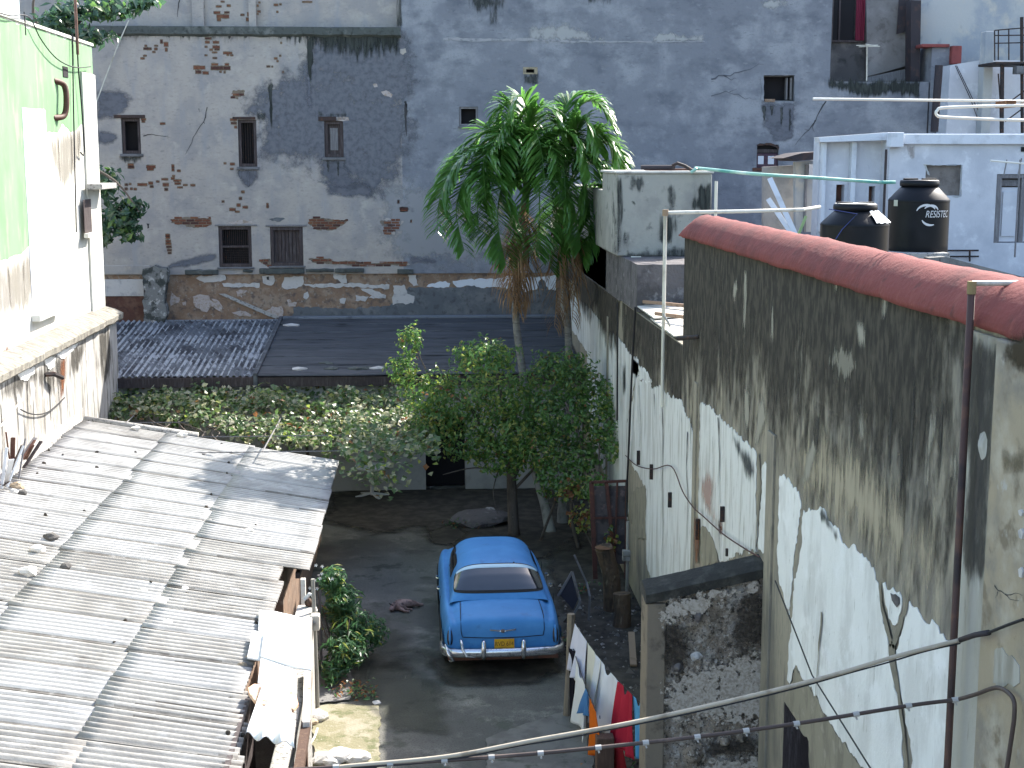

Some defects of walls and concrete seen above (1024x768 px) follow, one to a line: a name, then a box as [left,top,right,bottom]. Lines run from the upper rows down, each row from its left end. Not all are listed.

flaking render [193,37,234,75]
crack [711,64,763,99]
leakage [829,78,920,98]
leakage [246,0,509,263]
flaking render [124,163,196,191]
leakage [238,170,257,186]
flaking render [165,216,212,254]
flaking render [308,216,348,233]
peeling [170,257,556,318]
leakage [568,178,1024,582]
peeling [570,294,766,578]
peeling [777,474,950,768]